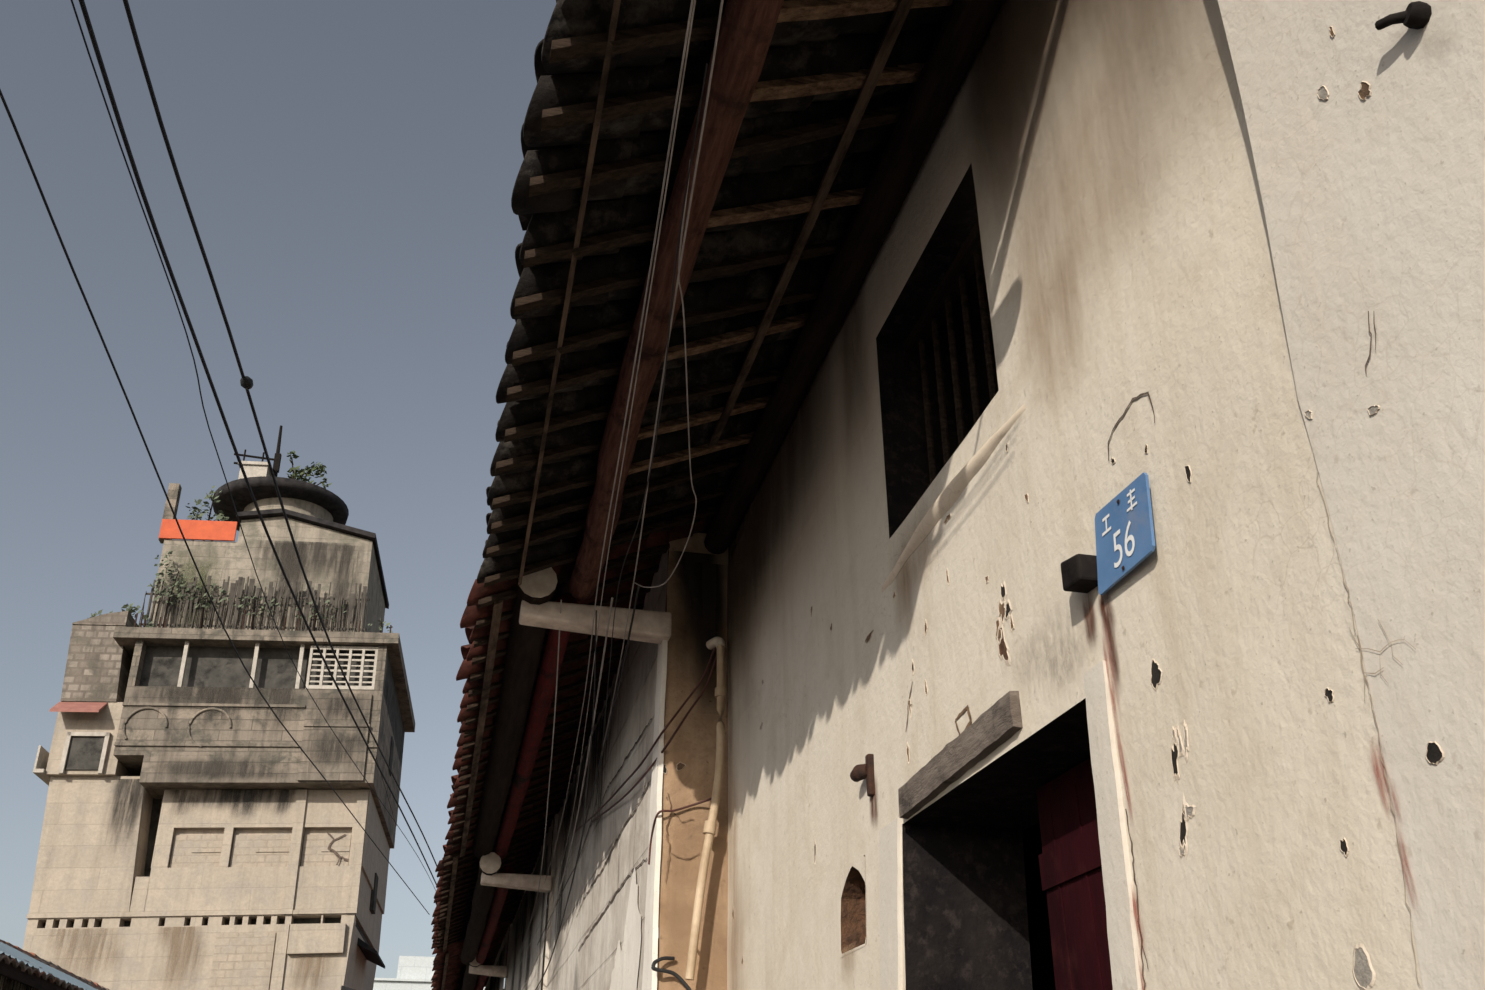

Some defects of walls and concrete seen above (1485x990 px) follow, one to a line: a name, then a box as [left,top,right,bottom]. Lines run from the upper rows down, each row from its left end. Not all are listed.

crack [1108,392,1155,461]
spalling [985,575,1015,666]
rust [1083,595,1118,709]
crack [1313,454,1422,989]
damp [112,779,144,829]
damp [174,761,289,810]
crack [327,832,349,865]